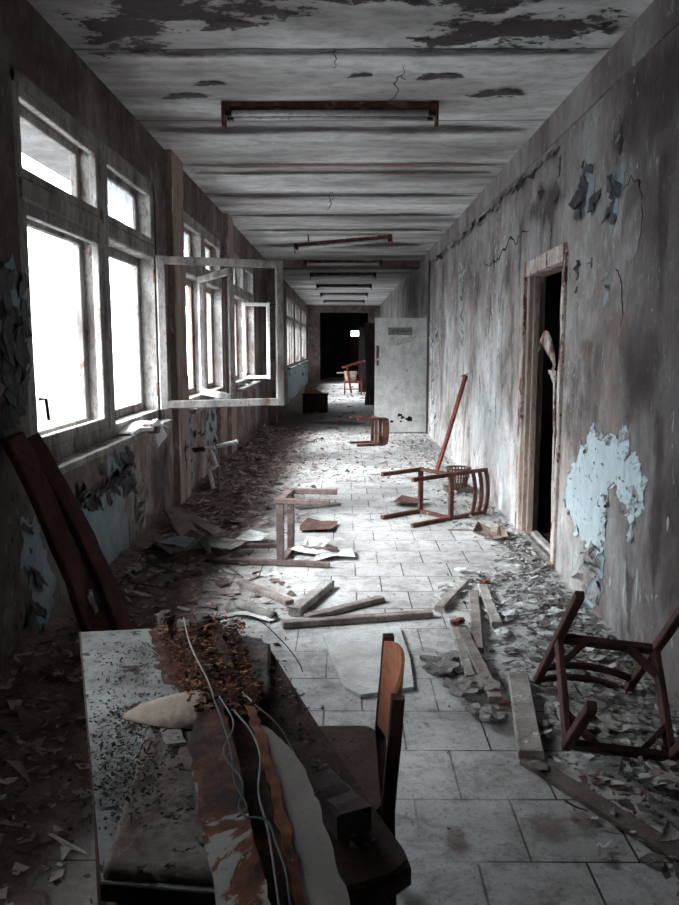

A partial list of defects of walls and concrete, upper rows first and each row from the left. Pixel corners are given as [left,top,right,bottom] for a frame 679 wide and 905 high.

crack [484,230,529,270]
peeling [0,253,33,430]
peeling [19,511,56,635]
peeling [77,445,152,565]
peeling [265,145,679,896]